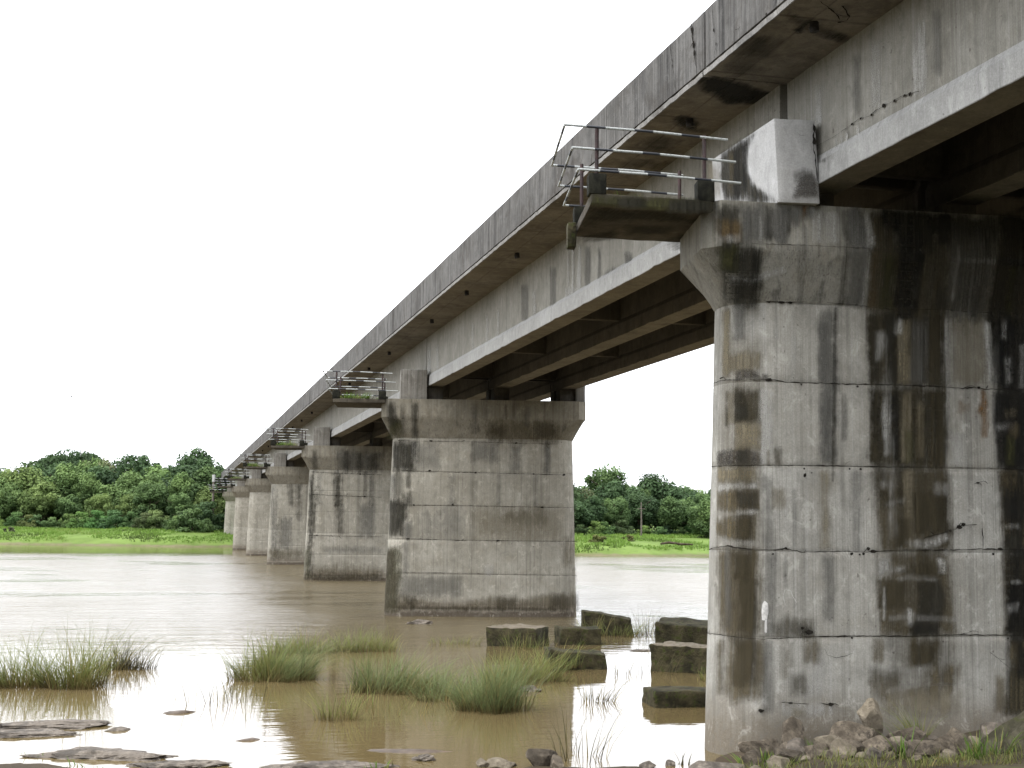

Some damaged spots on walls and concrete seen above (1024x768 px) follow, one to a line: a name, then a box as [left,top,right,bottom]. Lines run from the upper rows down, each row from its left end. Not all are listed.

water stain [700,77,770,105]
crack [799,91,919,206]
water stain [720,135,818,375]
water stain [388,404,417,485]
water stain [726,390,780,464]
water stain [819,312,845,487]
crack [713,377,1018,390]
water stain [845,207,1024,715]
water stain [389,498,410,536]
crack [709,523,1024,555]
water stain [716,467,772,699]